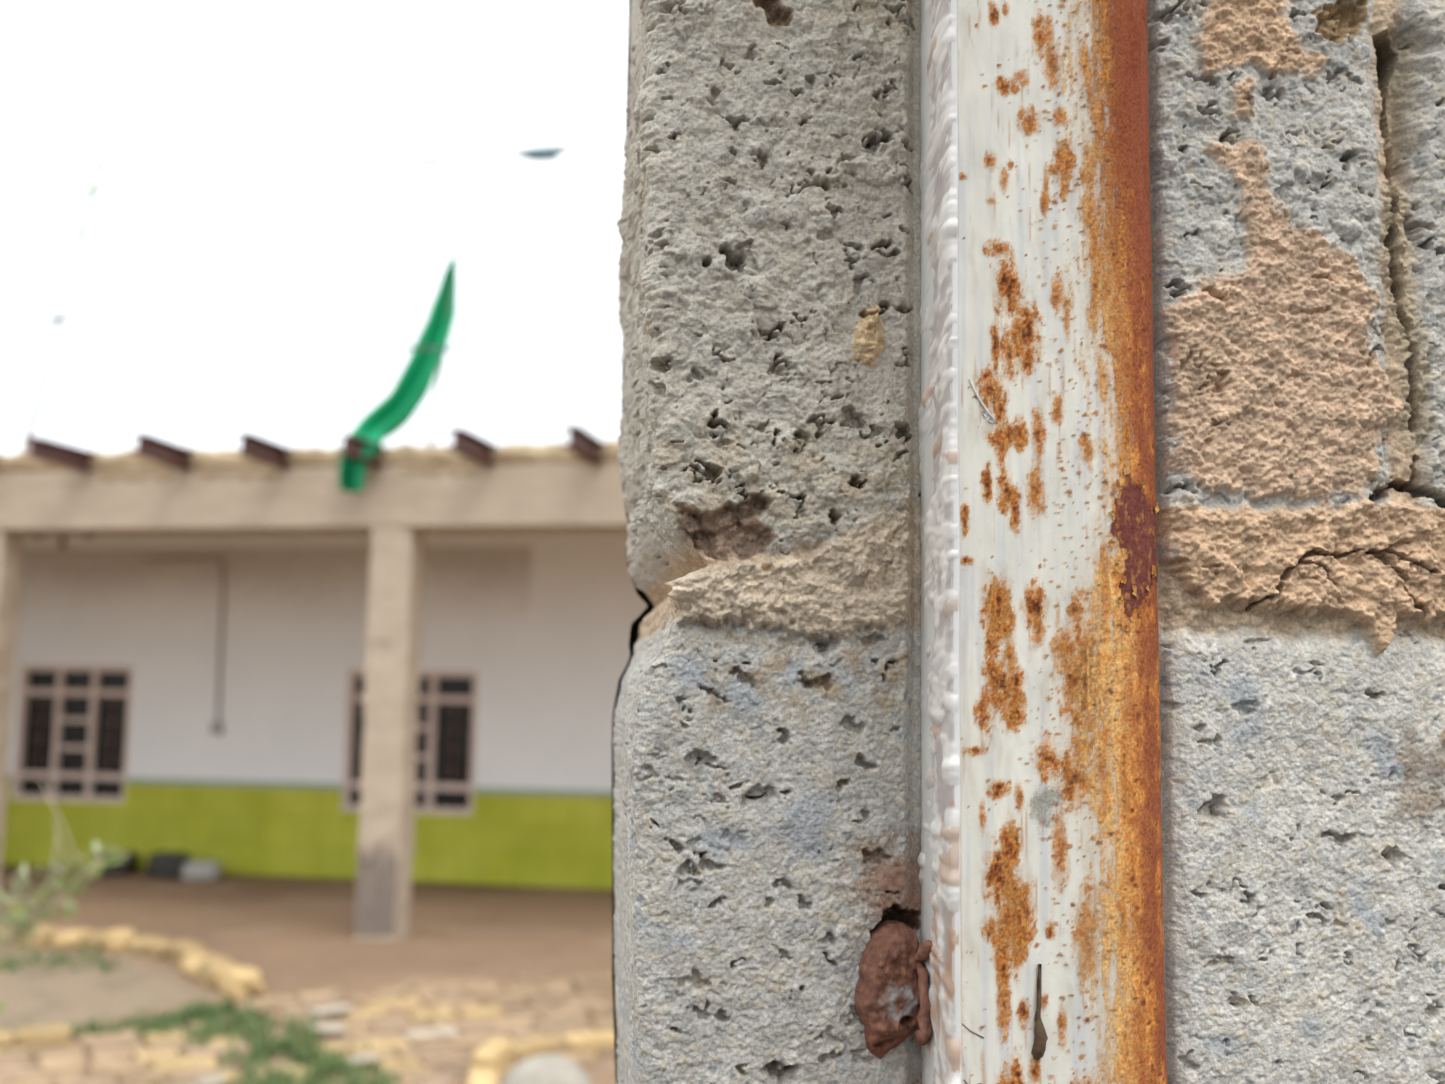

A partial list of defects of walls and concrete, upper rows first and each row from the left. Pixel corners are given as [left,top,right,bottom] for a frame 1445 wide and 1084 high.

crack [1369,28,1445,509]
spalling [672,490,780,564]
rust [960,504,970,537]
rust [965,0,1168,1084]
crack [1244,546,1442,617]